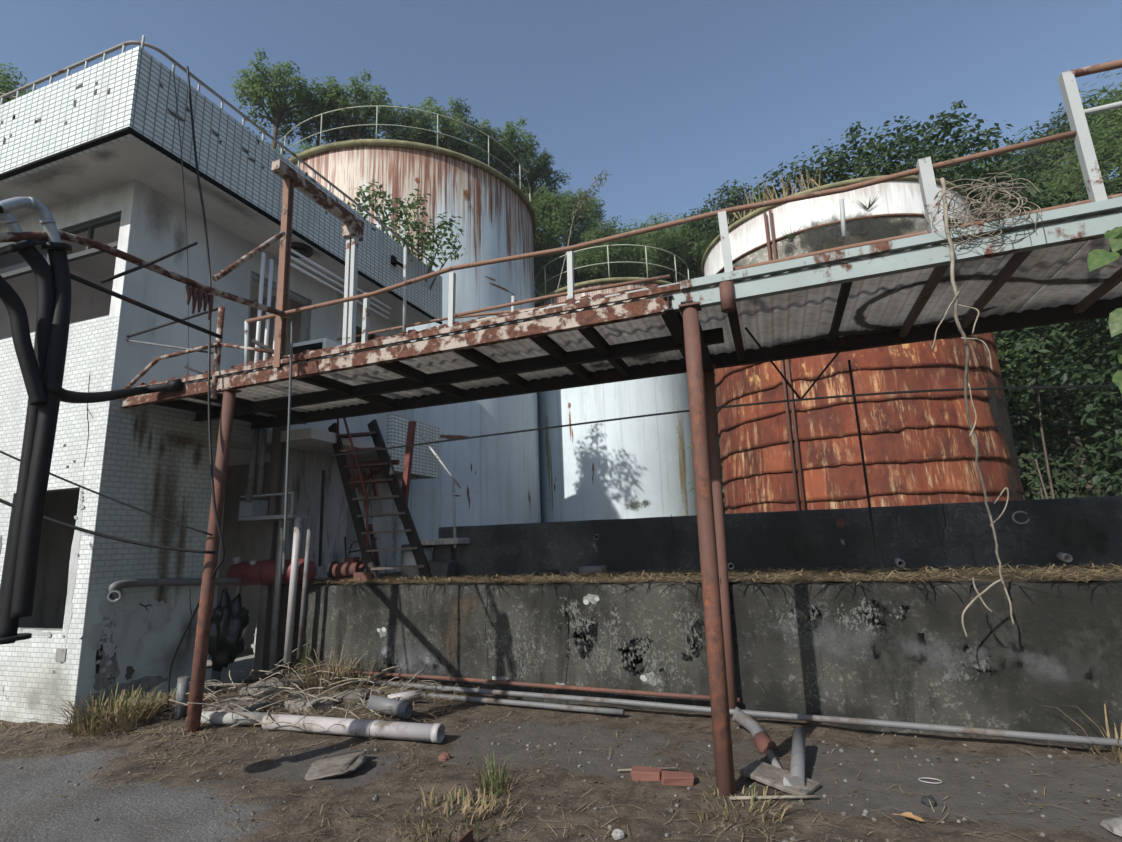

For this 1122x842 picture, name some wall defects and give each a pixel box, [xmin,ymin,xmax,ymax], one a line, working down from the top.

rust [464,173,493,245]
peeling [17,475,174,708]
peeling [475,615,565,690]
peeling [555,594,704,687]